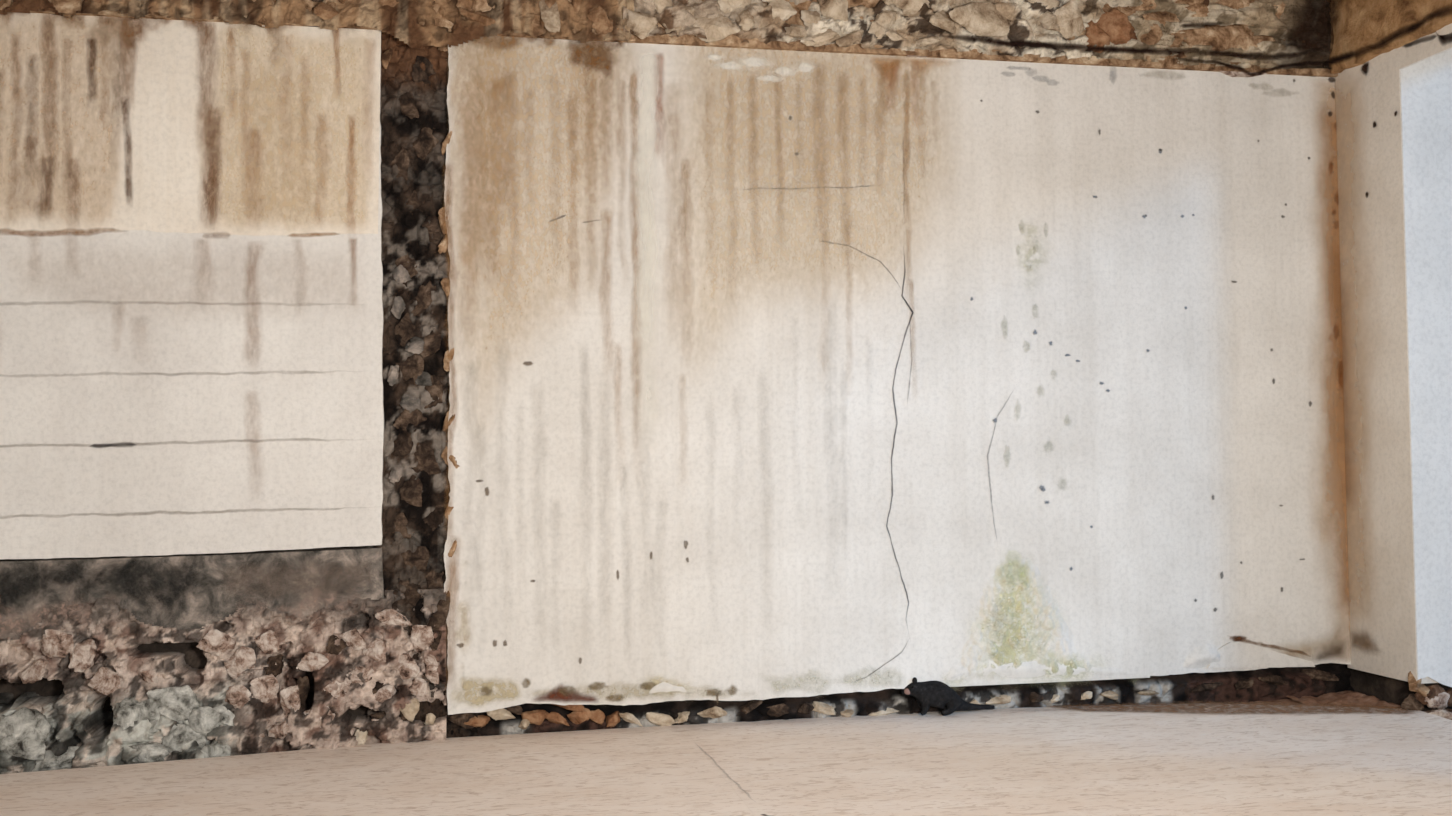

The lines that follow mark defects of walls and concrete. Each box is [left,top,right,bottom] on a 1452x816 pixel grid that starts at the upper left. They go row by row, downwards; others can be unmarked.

leakage [103,17,144,63]
spalling [0,0,1332,69]
leakage [473,36,621,315]
spalling [0,32,922,774]
crack [829,242,913,610]
flaking render [951,555,1355,710]
leakage [1287,636,1371,658]